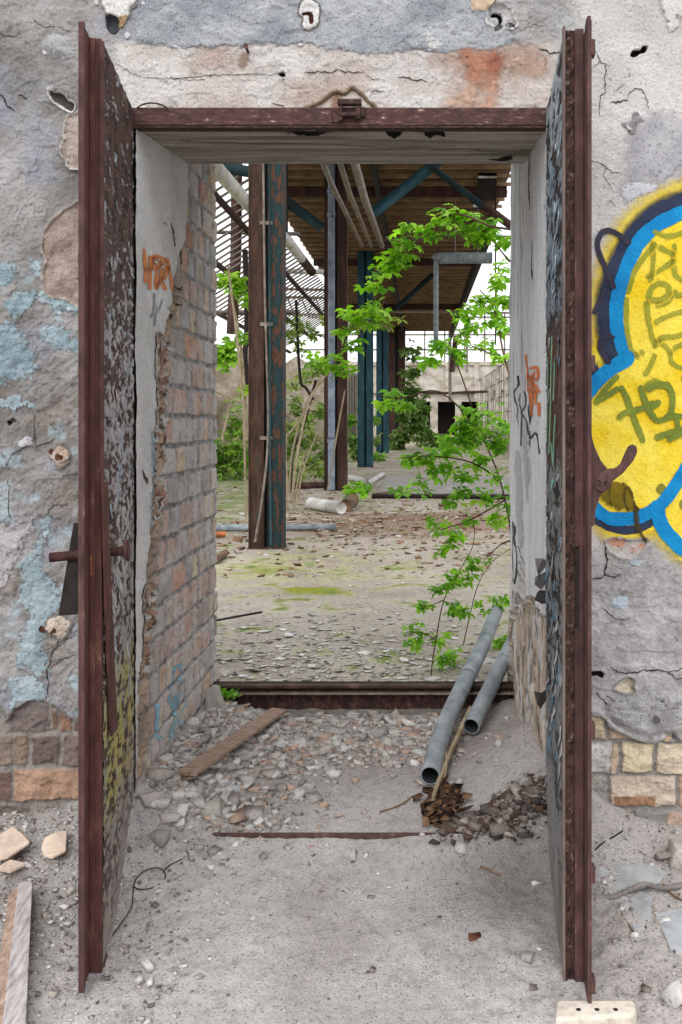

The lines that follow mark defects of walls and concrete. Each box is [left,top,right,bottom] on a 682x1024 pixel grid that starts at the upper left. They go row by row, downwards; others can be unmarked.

peeling [95,0,519,56]
crack [116,63,277,81]
corrosion [439,48,542,108]
crack [594,51,649,115]
spalling [46,87,78,170]
spalling [0,200,78,425]
peeling [18,437,32,447]
spalling [150,331,174,529]
crack [592,540,621,580]
spalling [0,512,78,816]
crack [45,635,78,700]
crack [610,667,682,709]